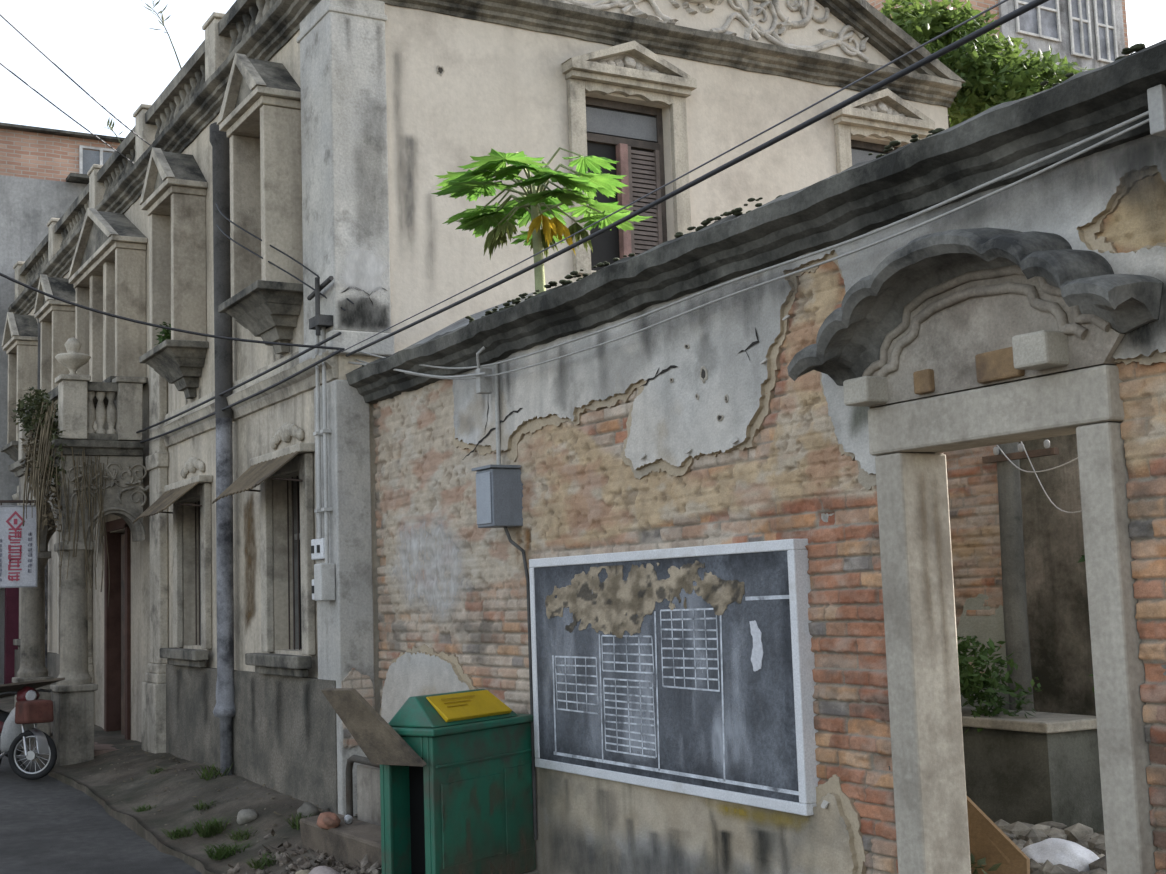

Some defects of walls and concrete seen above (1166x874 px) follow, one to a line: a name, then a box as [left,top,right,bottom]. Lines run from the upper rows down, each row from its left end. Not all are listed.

water stain [339,251,389,329]
spalling [1097,173,1166,253]
flaking render [341,261,898,874]
flaking render [1116,362,1166,874]